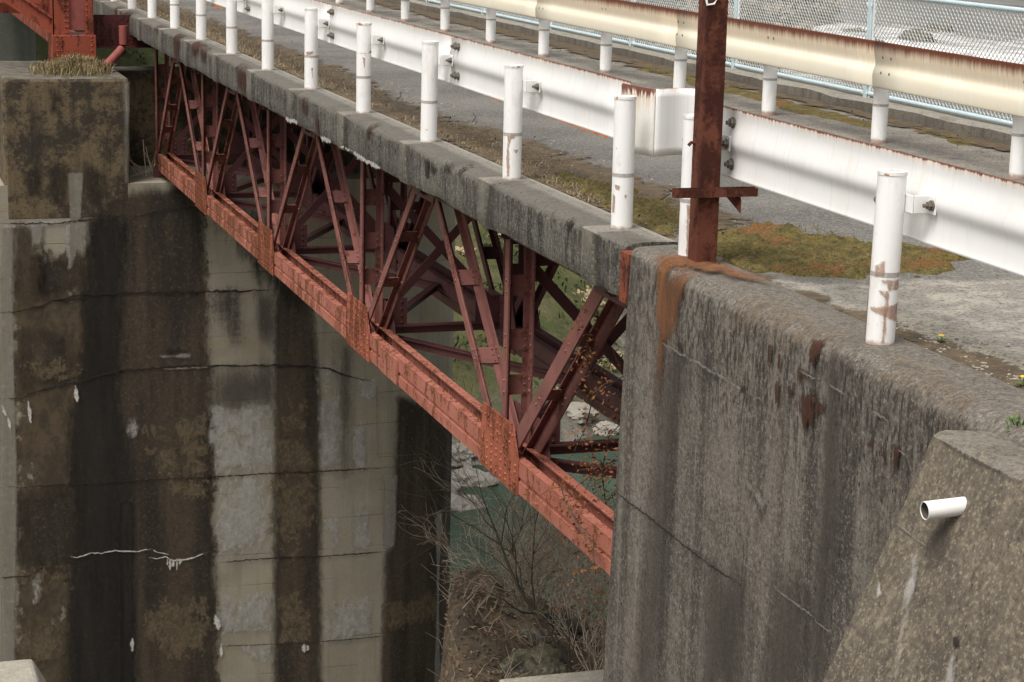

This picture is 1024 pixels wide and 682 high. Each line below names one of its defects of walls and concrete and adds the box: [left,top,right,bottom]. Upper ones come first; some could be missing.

rust [235,63,252,95]
damp [0,167,375,682]
crack [9,363,394,563]
damp [381,398,452,682]
rust [657,206,766,375]
rust [775,338,827,431]